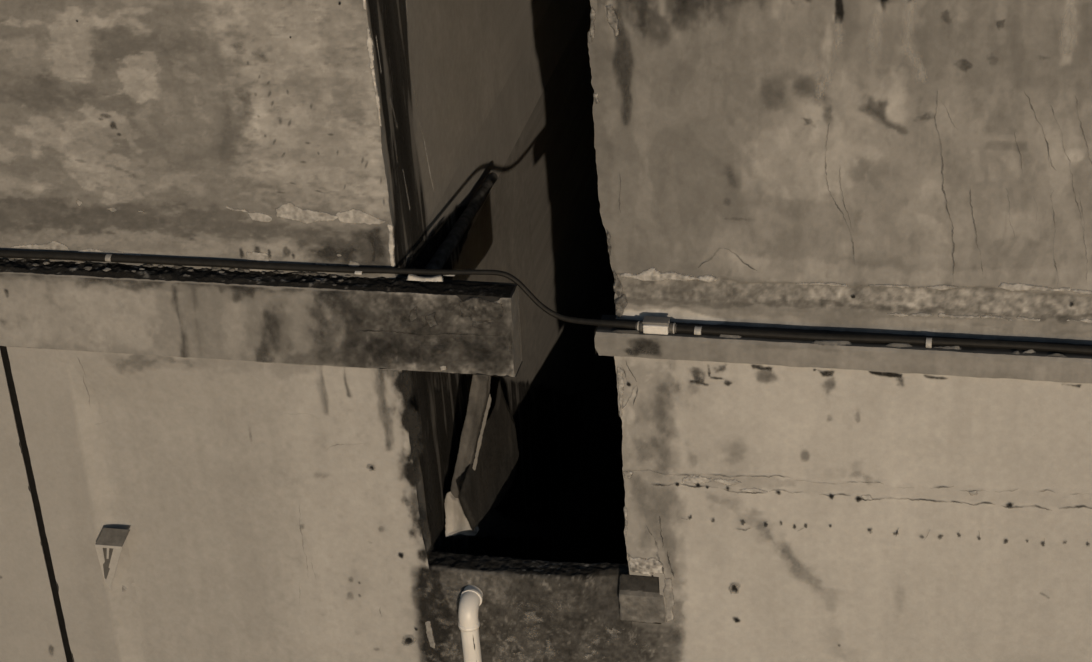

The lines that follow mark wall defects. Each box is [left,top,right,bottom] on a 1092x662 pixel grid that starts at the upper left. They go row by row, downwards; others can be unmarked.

spalling [366,28,381,126]
water stain [614,11,632,121]
water stain [836,0,844,45]
peeling [226,203,395,267]
crack [941,159,977,272]
crack [912,486,1010,508]